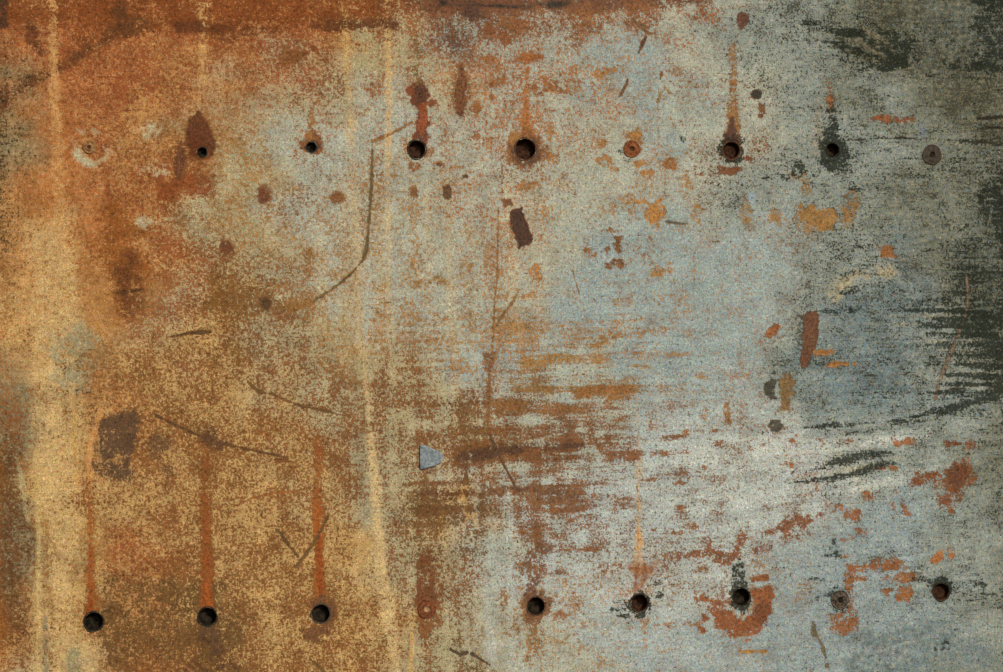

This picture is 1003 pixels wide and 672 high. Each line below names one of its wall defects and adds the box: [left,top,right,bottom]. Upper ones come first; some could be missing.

corrosion [0,0,48,104]
corrosion [59,0,338,80]
corrosion [82,110,222,331]
corrosion [217,236,237,258]
corrosion [197,243,324,330]
corrosion [254,181,274,207]
corrosion [298,102,326,157]
corrosion [350,0,754,287]
corrosion [736,187,864,240]
corrosion [71,400,262,672]
corrosion [297,426,340,649]
corrosion [375,312,989,672]